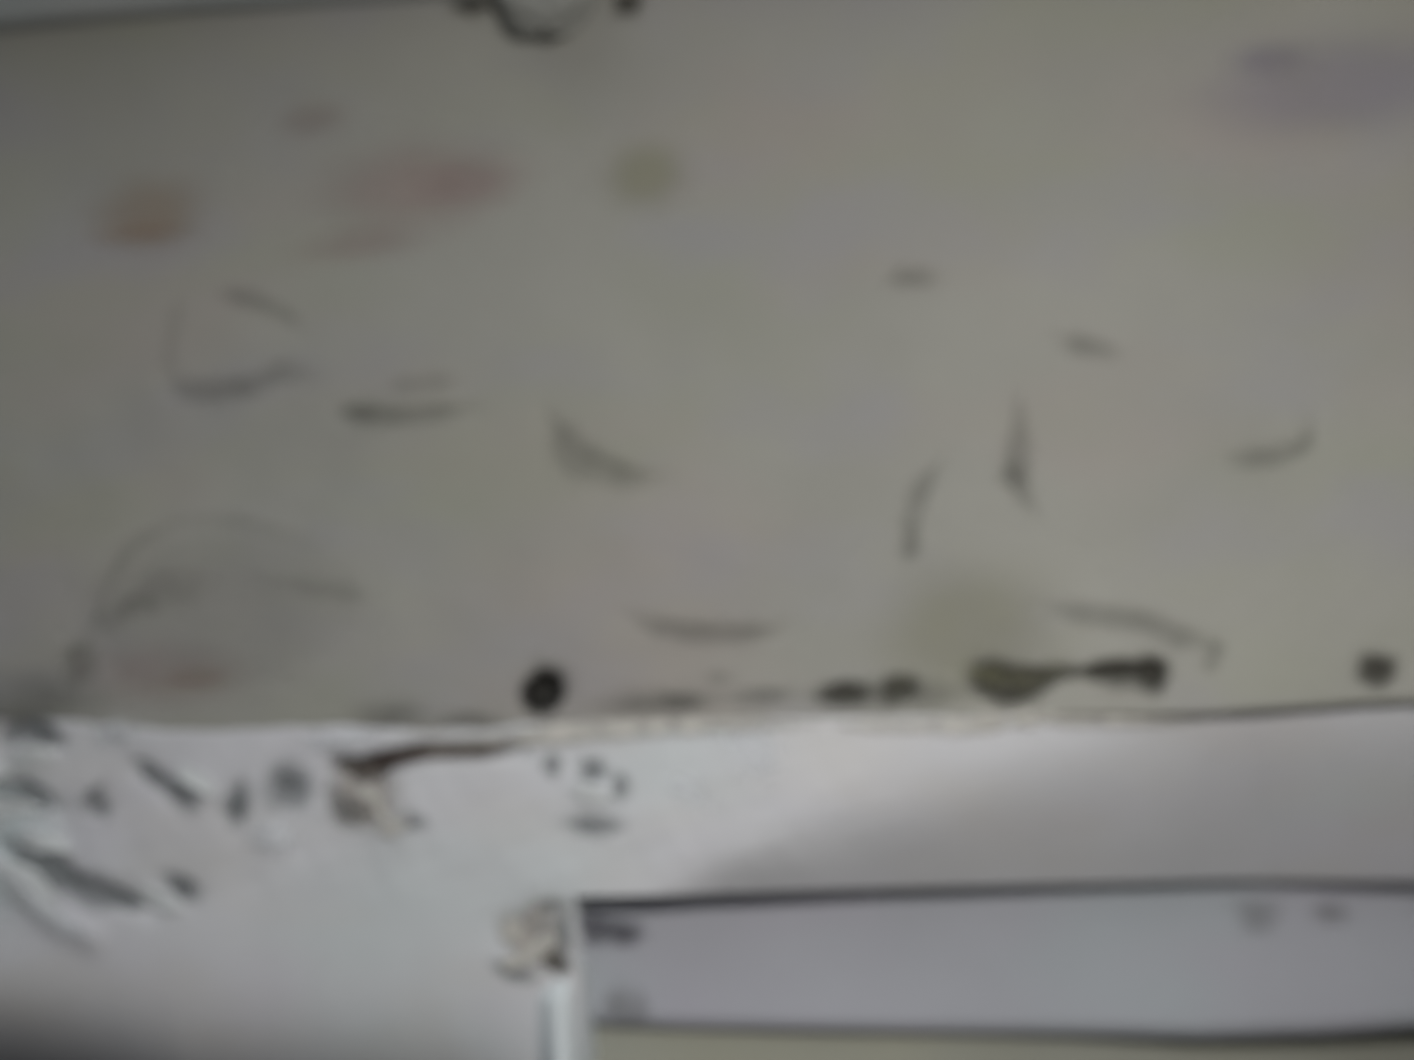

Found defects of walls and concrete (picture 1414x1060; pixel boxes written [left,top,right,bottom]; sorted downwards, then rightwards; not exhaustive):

spalling [819,678,915,703]
spalling [847,658,1193,733]
spalling [1362,658,1393,684]
spalling [432,718,763,772]
peeling [0,722,194,936]
peeling [142,763,245,820]
spalling [332,774,415,837]
spalling [500,903,570,979]